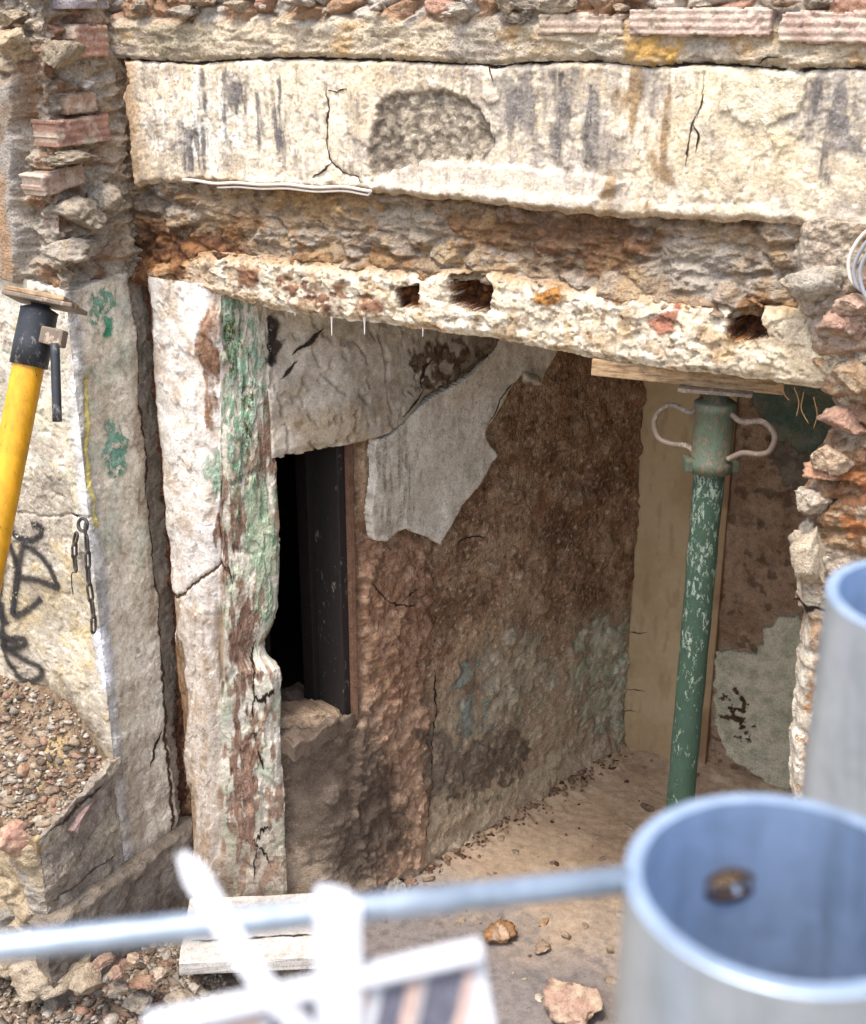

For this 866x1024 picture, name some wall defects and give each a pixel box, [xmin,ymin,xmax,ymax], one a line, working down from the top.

water stain [178,122,206,171]
water stain [199,68,207,111]
water stain [221,69,286,151]
crack [312,88,362,183]
crack [126,55,866,168]
spalling [397,284,420,308]
spalling [449,274,494,313]
spalling [726,299,769,342]
flaking render [363,338,557,544]
crack [132,314,233,831]
flaking render [713,614,813,798]
crack [245,826,271,884]